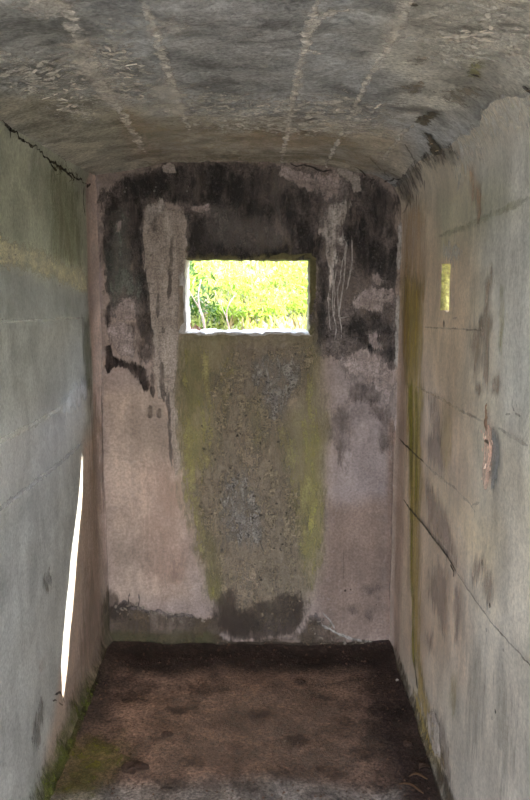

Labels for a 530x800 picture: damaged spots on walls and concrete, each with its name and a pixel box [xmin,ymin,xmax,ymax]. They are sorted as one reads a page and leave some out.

crack [3,121,91,212]
damp [97,145,457,800]
spalling [480,403,500,489]
crack [404,500,530,666]